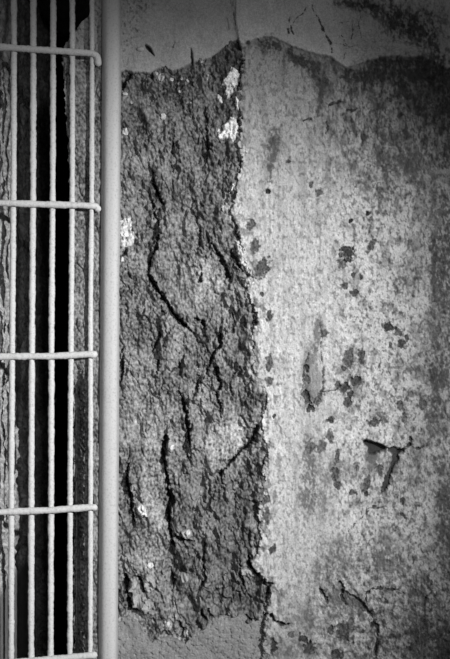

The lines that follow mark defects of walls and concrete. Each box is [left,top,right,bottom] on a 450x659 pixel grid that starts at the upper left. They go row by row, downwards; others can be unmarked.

crack [287,4,361,56]
leakage [258,38,329,115]
leakage [337,0,450,158]
leakage [265,128,280,183]
spalling [62,57,102,659]
spalling [118,40,273,643]
spalling [305,431,340,490]
spalling [349,440,386,496]
crack [319,581,398,654]